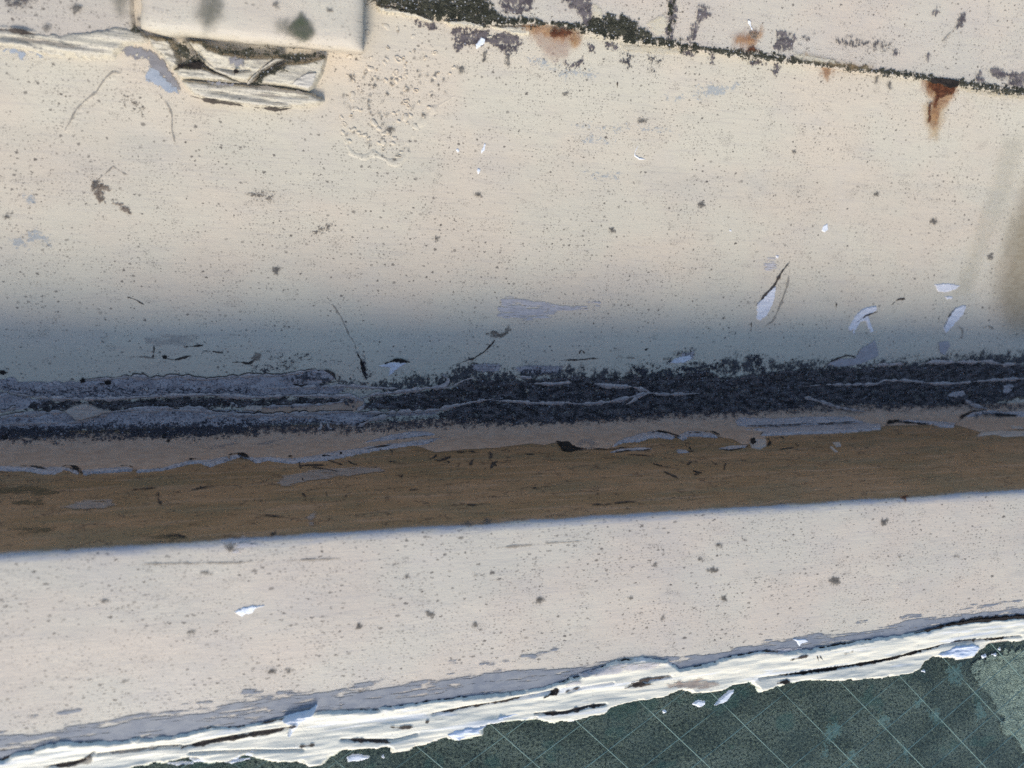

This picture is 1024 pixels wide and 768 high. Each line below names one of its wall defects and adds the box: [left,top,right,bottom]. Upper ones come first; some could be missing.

corrosion [526,24,580,46]
peeling [122,46,180,95]
corrosion [925,78,960,125]
peeling [756,255,790,325]
peeling [0,283,1024,476]
peeling [234,605,264,616]
peeling [644,600,1024,669]
peeling [0,648,614,760]